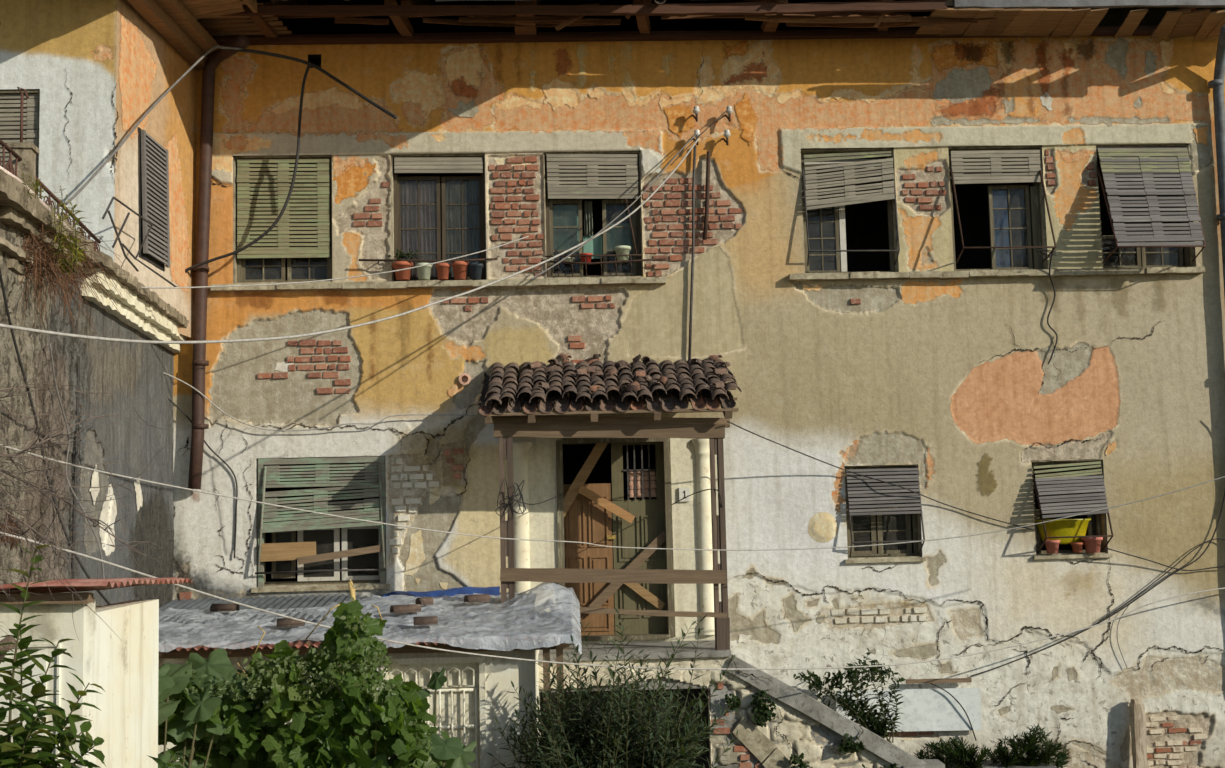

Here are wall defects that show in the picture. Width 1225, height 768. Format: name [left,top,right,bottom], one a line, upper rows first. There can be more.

crack [64,66,75,179]
peeling [209,37,1213,592]
spalling [728,568,935,644]
spalling [950,609,984,640]
crack [739,558,1224,706]
spalling [1115,655,1225,699]
spalling [1064,727,1132,768]
spalling [1145,710,1220,768]